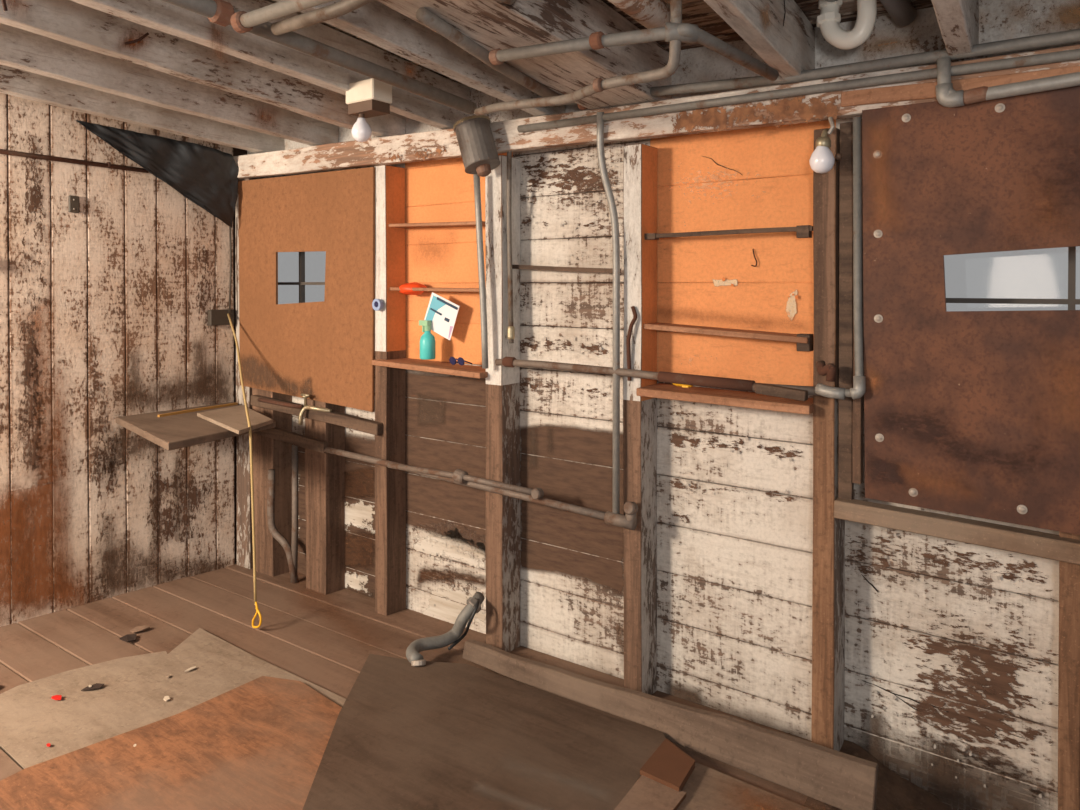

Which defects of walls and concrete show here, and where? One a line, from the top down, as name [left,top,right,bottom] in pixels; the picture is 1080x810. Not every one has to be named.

peeling [520,149,622,231]
peeling [0,131,51,473]
leakage [118,342,230,411]
leakage [241,357,311,395]
peeling [520,333,608,357]
rust [0,351,89,616]
leakage [103,432,159,474]
peeling [669,432,804,461]
leakage [97,488,221,597]
peeling [845,533,1052,592]
peeling [423,582,486,624]
peeling [867,609,1058,798]